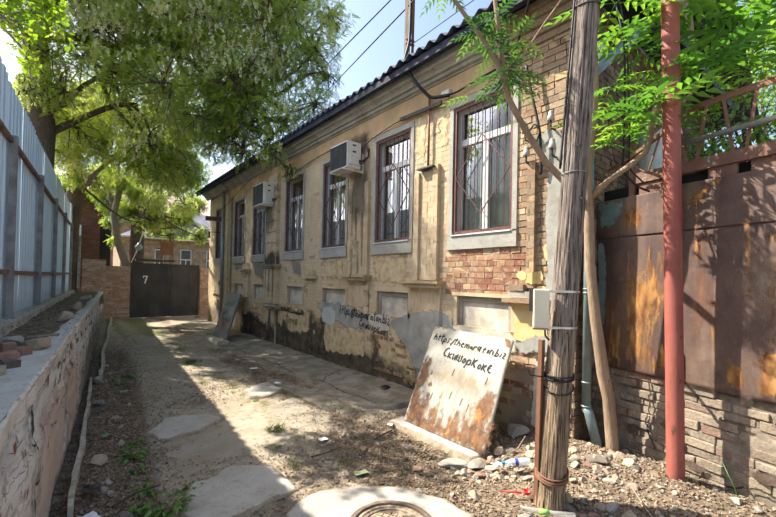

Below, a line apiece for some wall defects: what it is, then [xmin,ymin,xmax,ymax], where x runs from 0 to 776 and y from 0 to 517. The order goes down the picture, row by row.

flaking render [439,29,571,432]
corrosion [625,205,641,228]
crack [0,326,94,516]
leakage [241,308,416,390]
flaking render [277,303,416,386]
corrosion [607,268,664,369]
crack [644,378,655,449]
corrosion [760,353,776,396]